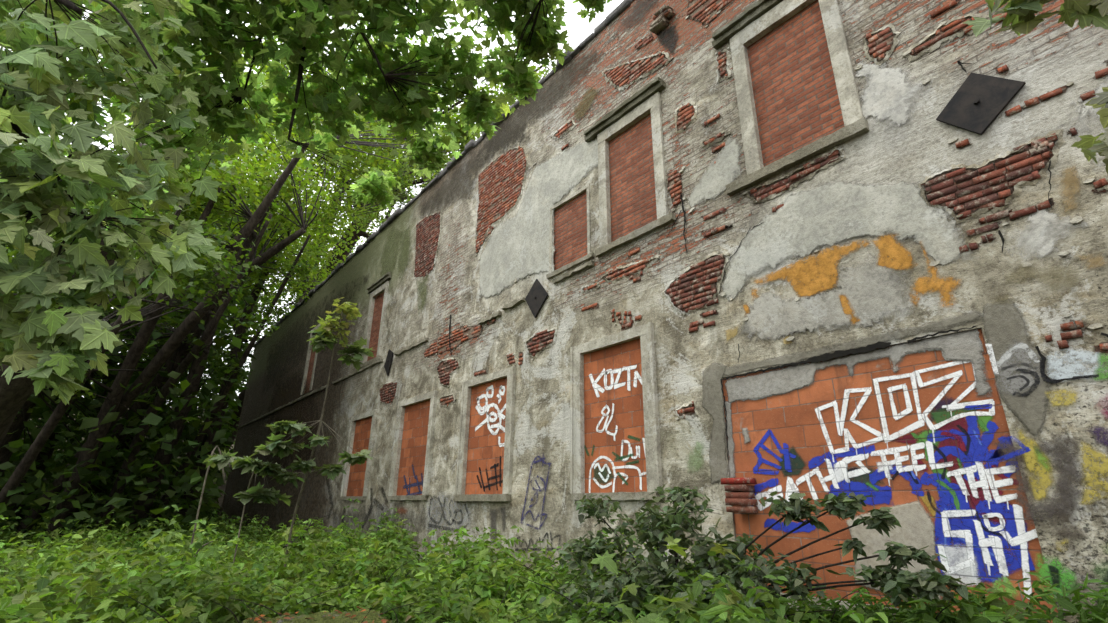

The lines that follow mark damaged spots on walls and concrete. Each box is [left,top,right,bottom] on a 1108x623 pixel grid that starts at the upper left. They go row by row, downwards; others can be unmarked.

peeling [855,0,1007,128]
flaking render [413,211,442,280]
flaking render [475,145,536,256]
crack [667,193,687,252]
flaking render [666,166,734,238]
flaking render [742,146,846,212]
flaking render [918,60,1108,268]
flaking render [580,248,661,331]
flaking render [661,251,733,333]
flaking render [742,262,911,341]
flaking render [423,318,496,409]
flaking render [505,327,557,367]